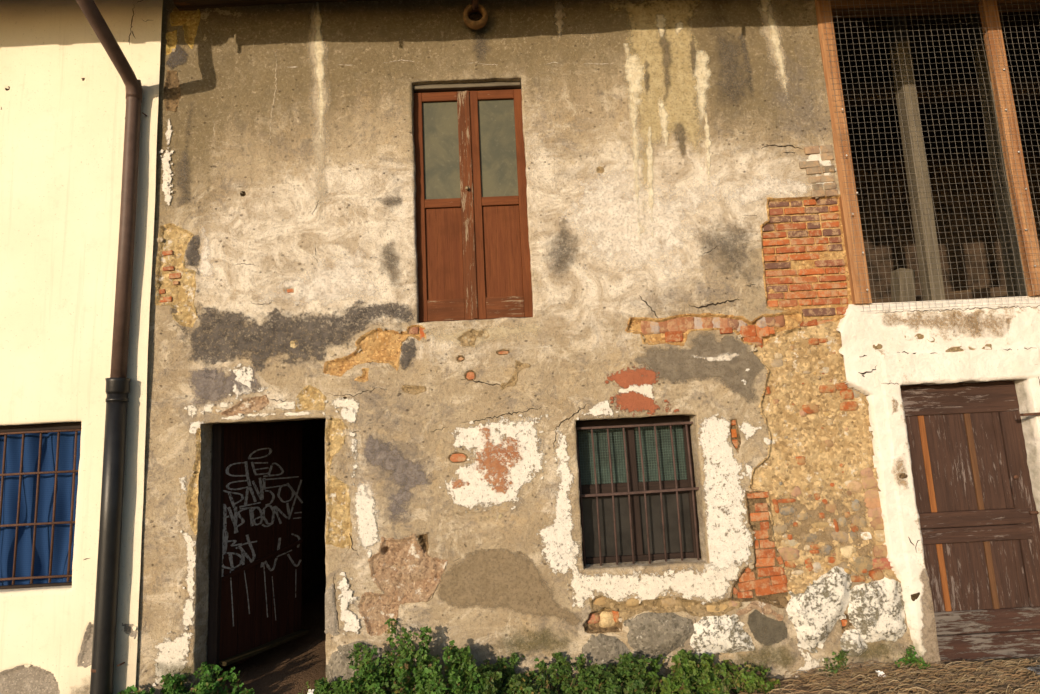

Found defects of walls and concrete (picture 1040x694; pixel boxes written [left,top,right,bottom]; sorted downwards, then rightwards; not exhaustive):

leakage [309,4,328,201]
leakage [555,0,807,279]
spalling [155,223,198,328]
leakage [185,230,213,276]
leakage [174,245,416,407]
spalling [323,325,428,382]
spalling [439,145,901,634]
leakage [635,333,764,401]
spalling [905,334,935,342]
spalling [153,363,448,687]
leakage [438,548,580,626]
spalling [0,664,60,694]